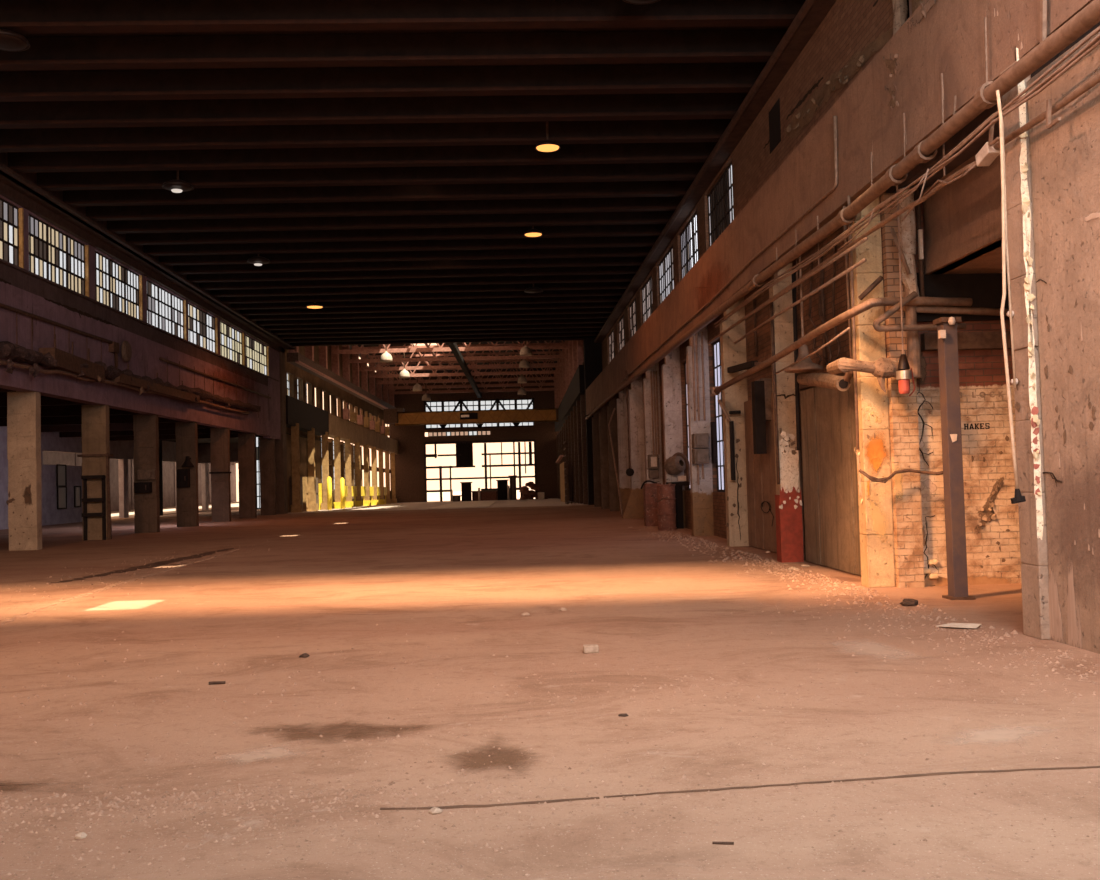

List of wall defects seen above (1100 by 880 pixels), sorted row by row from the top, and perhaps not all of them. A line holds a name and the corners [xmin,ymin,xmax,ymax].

peeling [1015,80,1048,540]
peeling [779,428,802,509]
corrosion [866,436,887,495]
spalling [975,477,1004,533]
leakage [1048,566,1082,649]